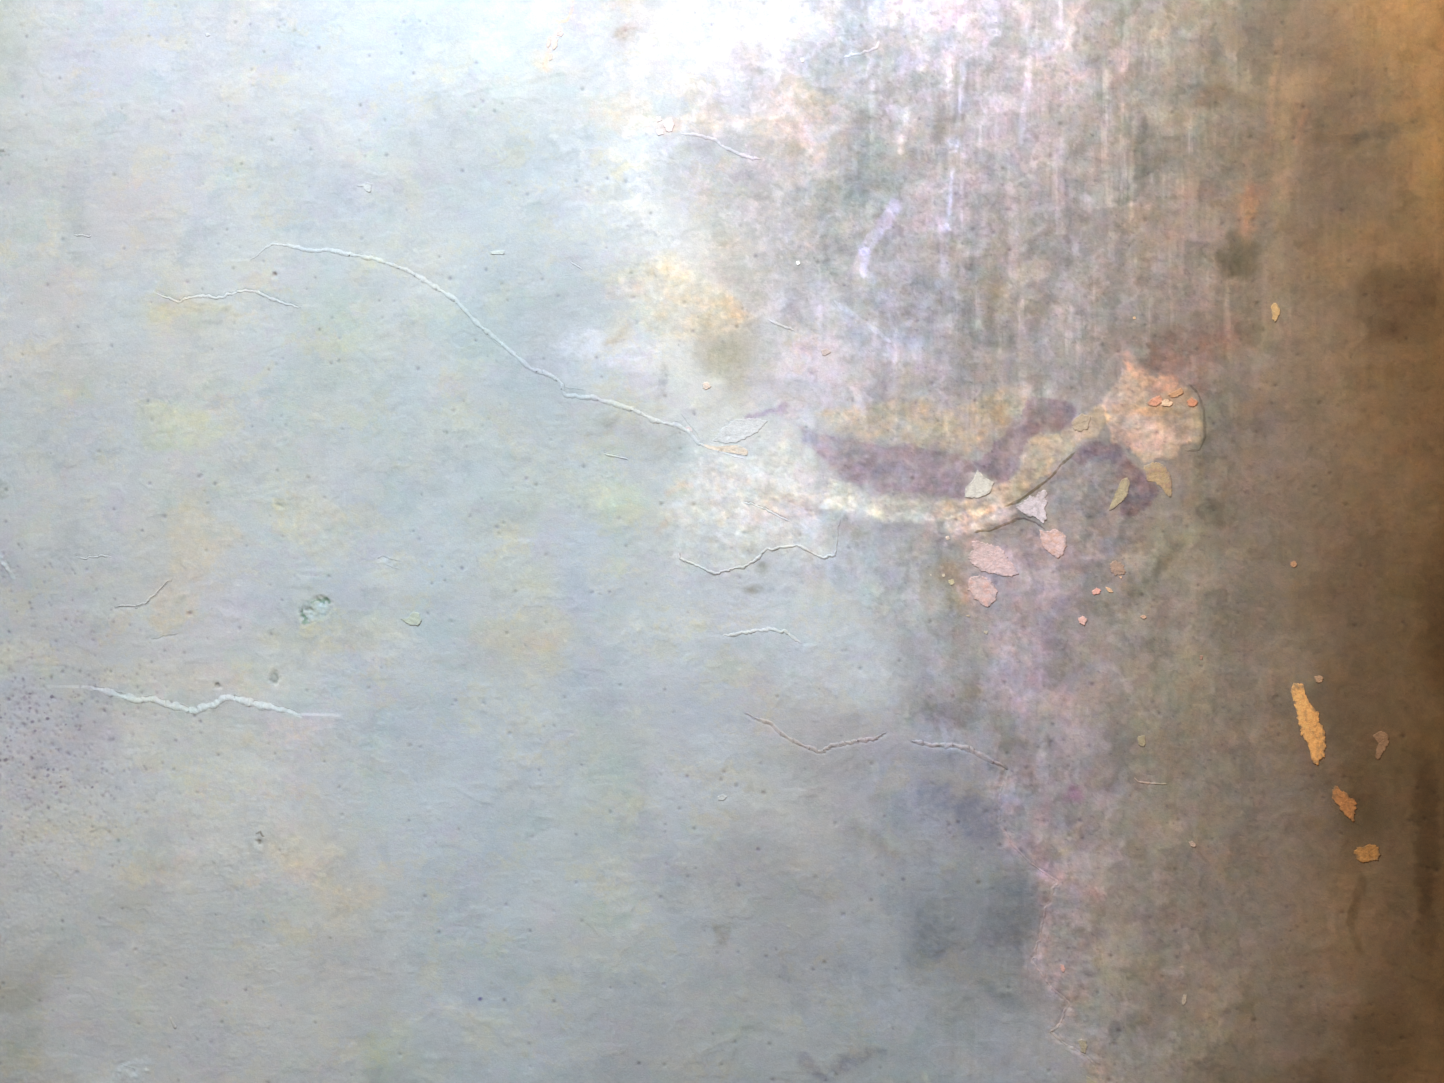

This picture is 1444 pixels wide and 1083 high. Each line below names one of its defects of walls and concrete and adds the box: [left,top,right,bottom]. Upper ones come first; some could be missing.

damp [572,0,922,301]
crack [155,241,745,460]
damp [542,249,763,472]
damp [742,382,1080,499]
peeling [965,470,995,499]
peeling [967,541,1019,607]
peeling [1016,490,1067,559]
peeling [1099,348,1211,525]
damp [765,624,925,721]
peeling [1291,675,1326,766]
damp [842,530,1197,1083]
peeling [1332,786,1357,822]